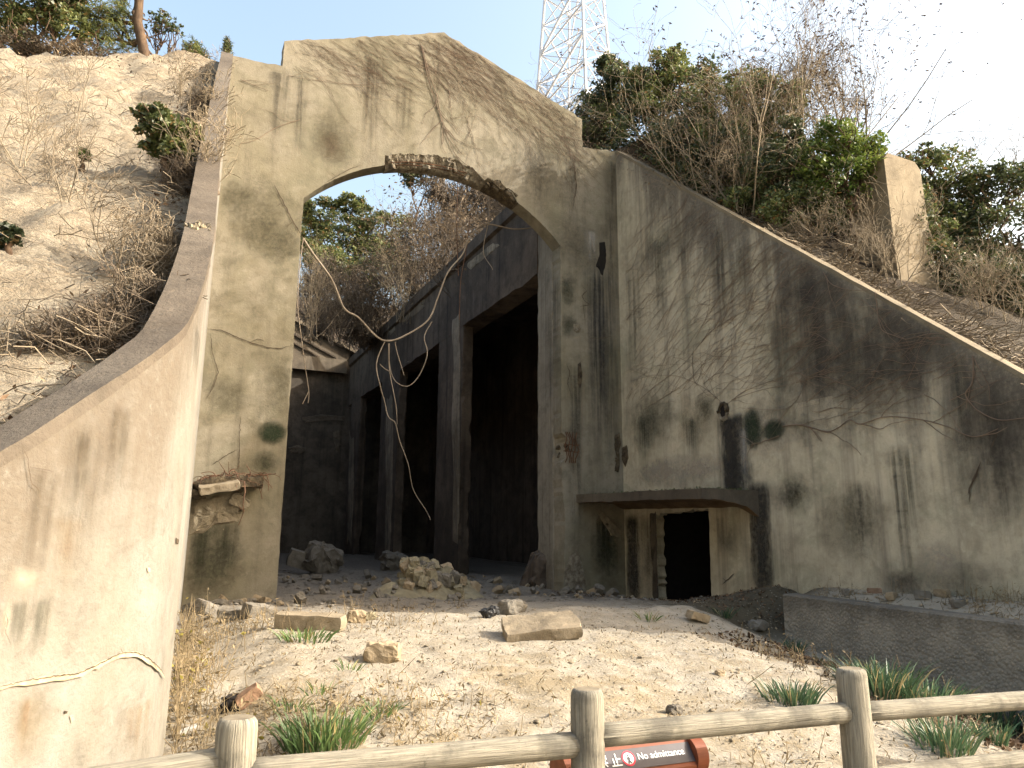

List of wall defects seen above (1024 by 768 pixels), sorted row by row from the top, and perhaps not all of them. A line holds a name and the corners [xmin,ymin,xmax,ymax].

spalling [383,153,518,210]
crack [206,329,293,399]
spalling [176,491,244,544]
water stain [720,415,772,588]
water stain [626,517,639,598]
crack [0,650,165,690]